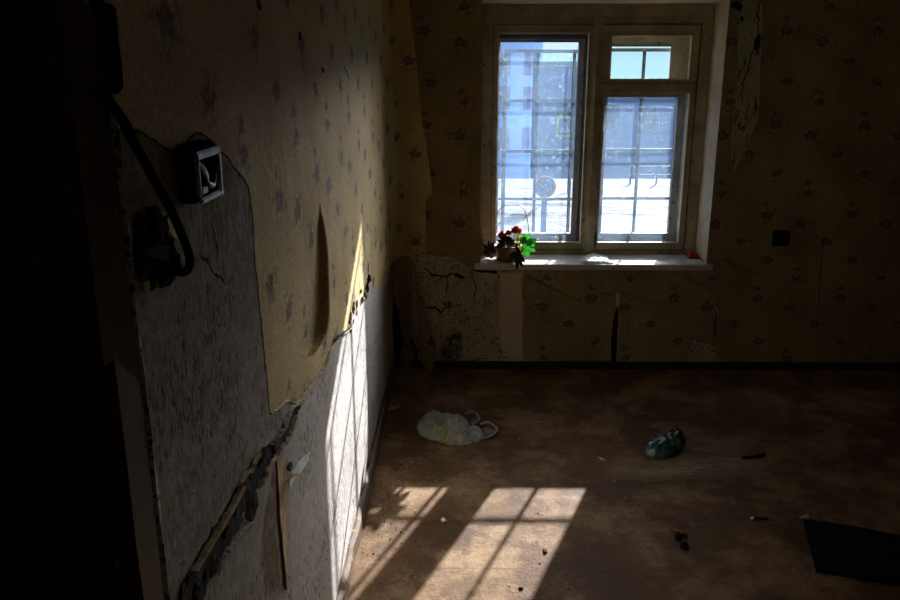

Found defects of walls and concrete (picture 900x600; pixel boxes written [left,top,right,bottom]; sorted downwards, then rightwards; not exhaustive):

peeling [731,0,762,173]
peeling [119,129,526,600]
crack [425,264,494,315]